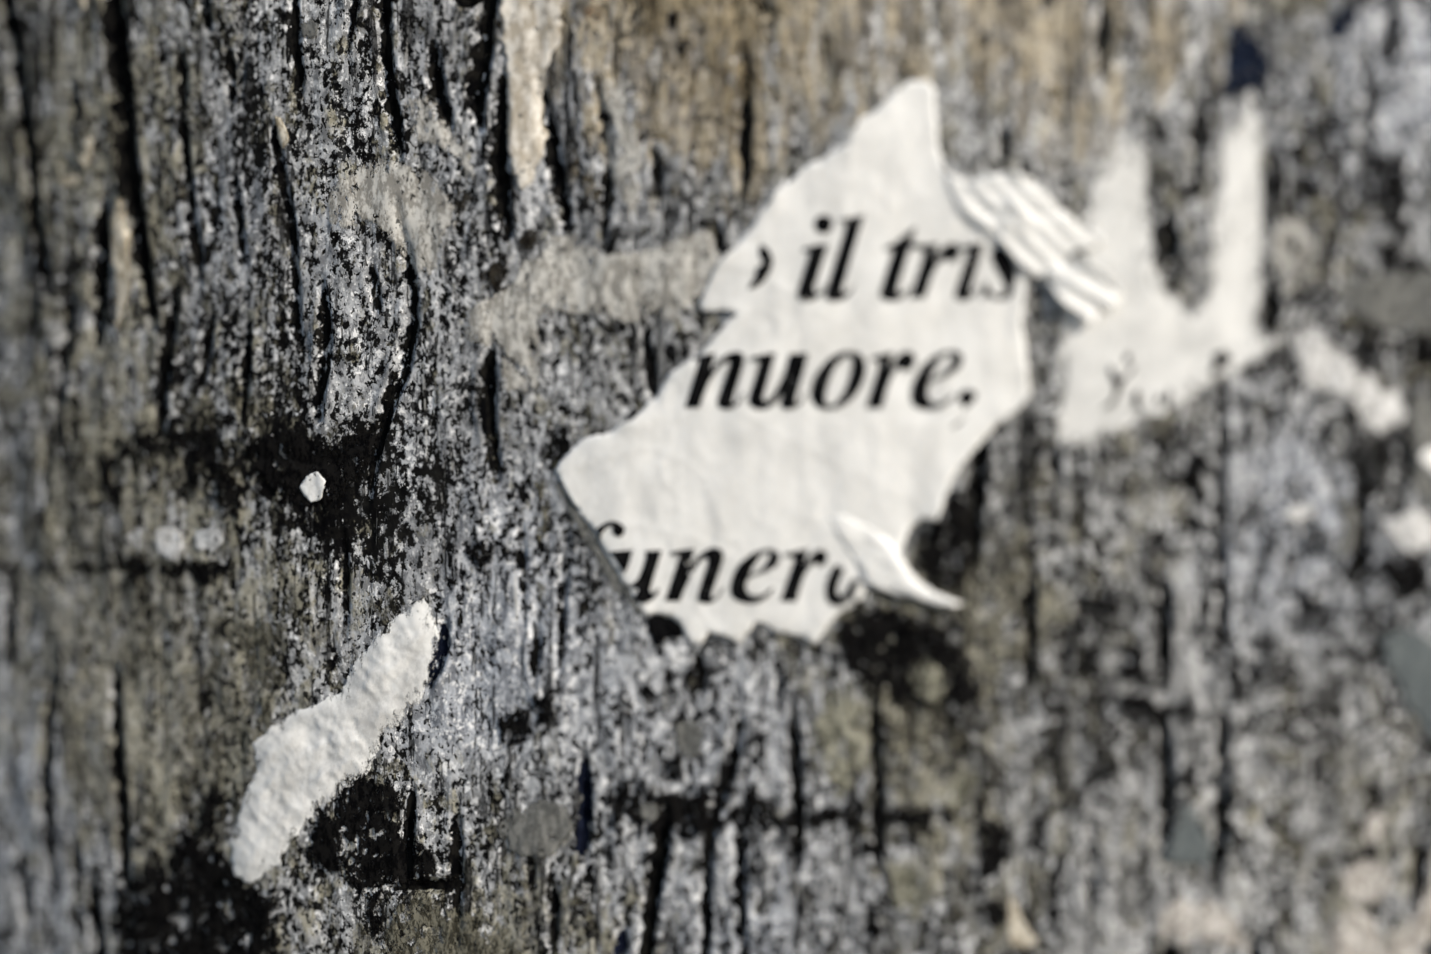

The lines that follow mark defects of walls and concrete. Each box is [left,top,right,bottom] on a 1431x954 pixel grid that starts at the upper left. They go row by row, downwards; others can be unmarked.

peeling [601,79,643,215]